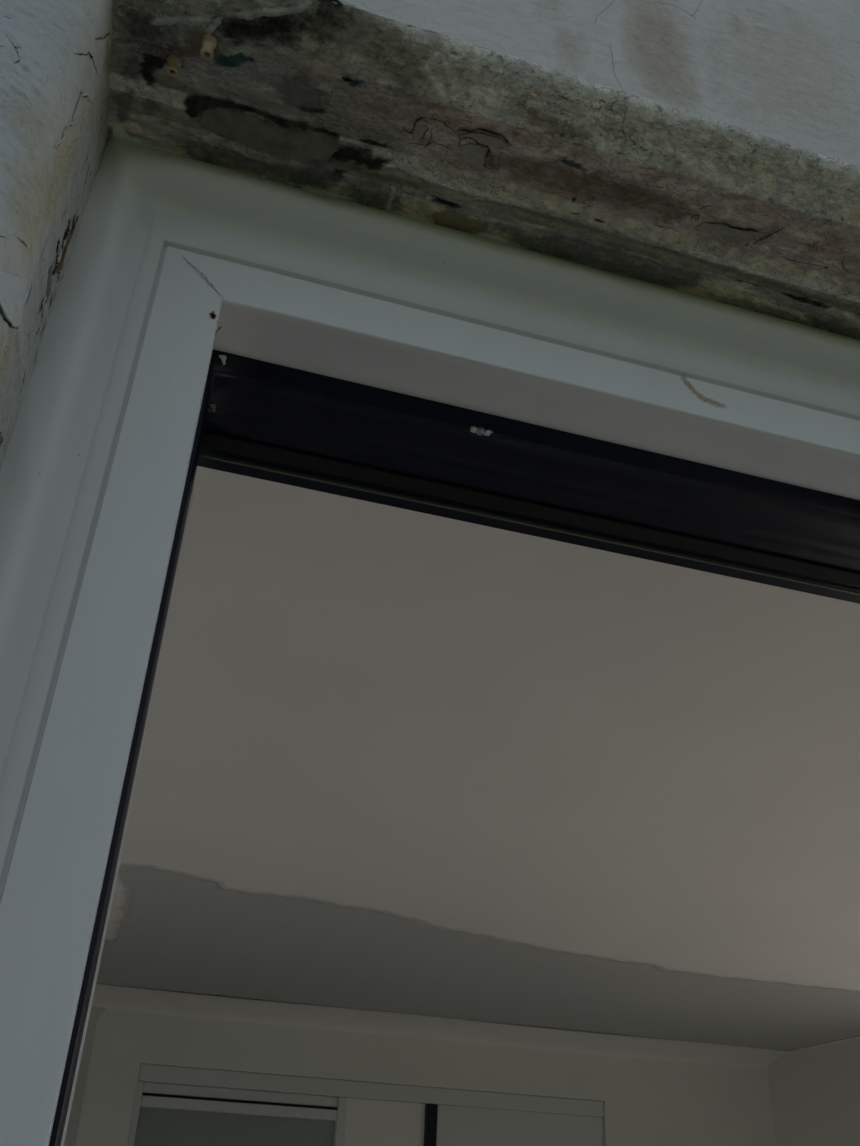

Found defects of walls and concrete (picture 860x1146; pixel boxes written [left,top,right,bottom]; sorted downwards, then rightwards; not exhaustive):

water stain [212,0,343,43]
water stain [118,10,198,121]
water stain [184,78,398,212]
peeling [400,117,510,171]
water stain [497,224,699,287]
peeling [0,215,79,392]
water stain [782,293,860,340]